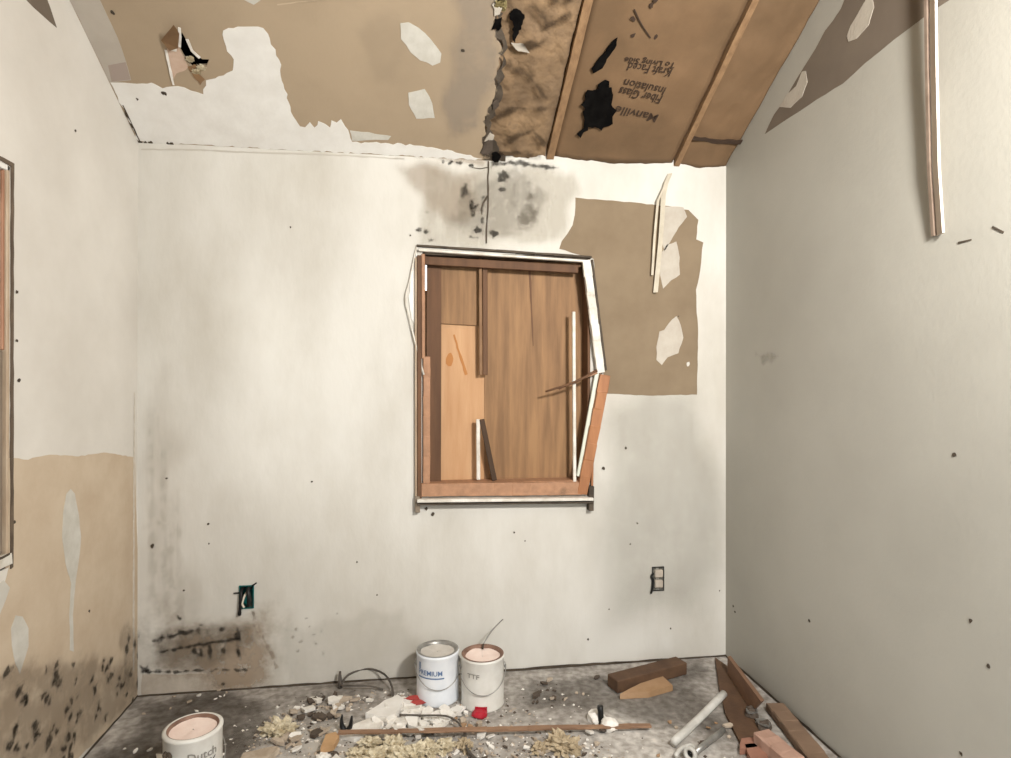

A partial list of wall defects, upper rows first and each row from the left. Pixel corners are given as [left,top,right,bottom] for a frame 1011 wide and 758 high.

peeling [492,0,502,31]
spalling [161,25,207,85]
peeling [765,0,949,134]
peeling [480,133,501,162]
leakage [492,160,554,191]
leakage [461,184,498,237]
peeling [559,197,703,396]
peeling [0,452,138,758]
leakage [42,662,60,705]
leakage [102,617,266,758]
leakage [6,699,81,758]